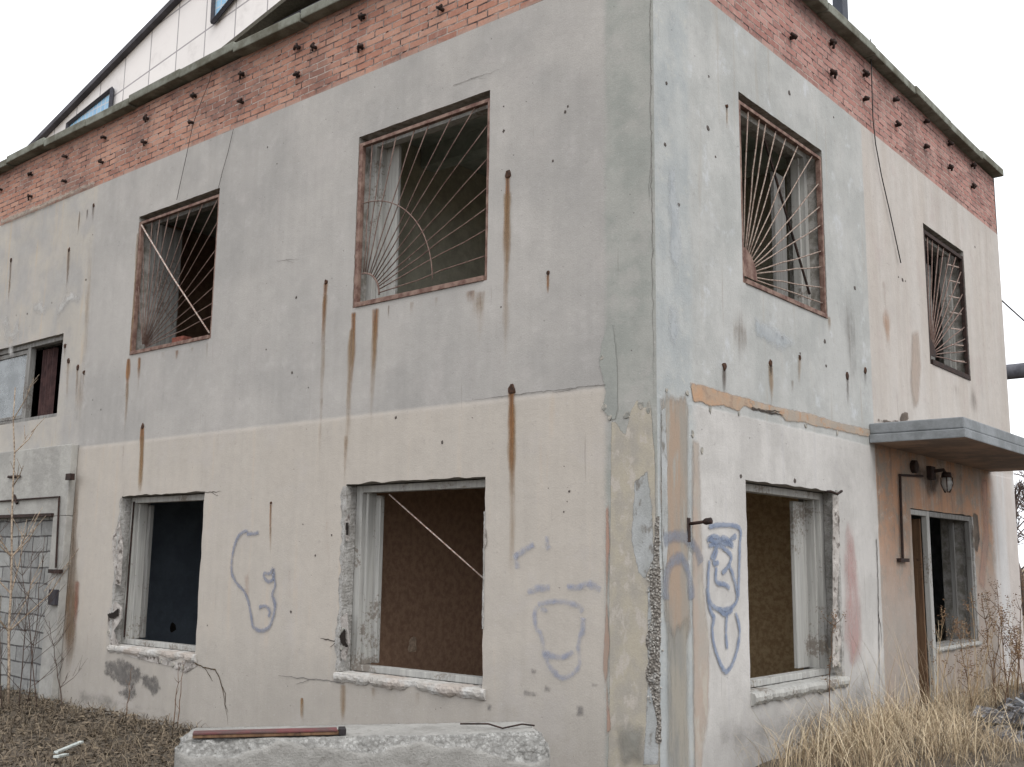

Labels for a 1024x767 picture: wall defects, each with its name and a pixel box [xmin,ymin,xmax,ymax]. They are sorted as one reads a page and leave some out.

rust [373,306,389,363]
rust [508,384,516,473]
spalling [112,521,123,586]
flaking render [599,325,920,767]
spalling [339,613,350,661]
damp [106,662,158,699]